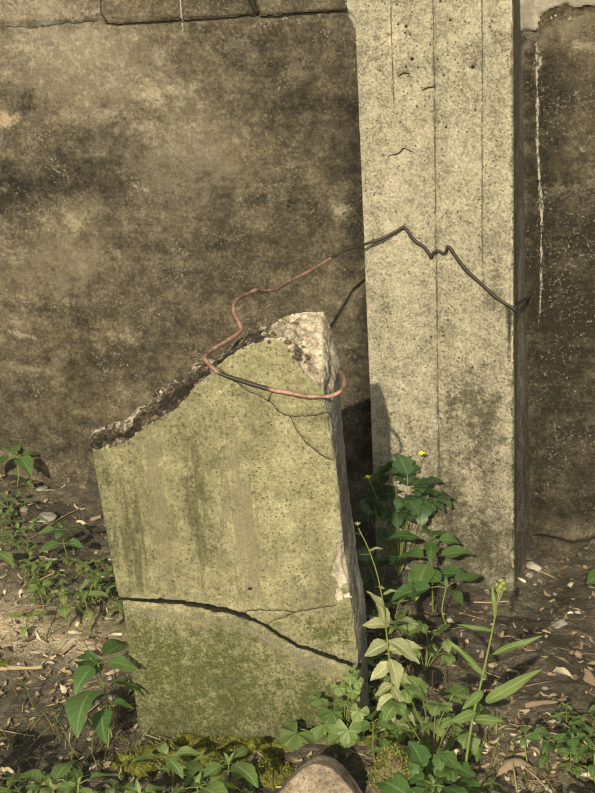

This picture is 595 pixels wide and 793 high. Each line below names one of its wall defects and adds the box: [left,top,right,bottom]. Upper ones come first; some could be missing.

water stain [0,0,103,44]
water stain [524,33,543,319]
spalling [88,312,340,451]
crack [214,365,334,461]
crack [534,534,595,544]
crack [118,597,361,668]